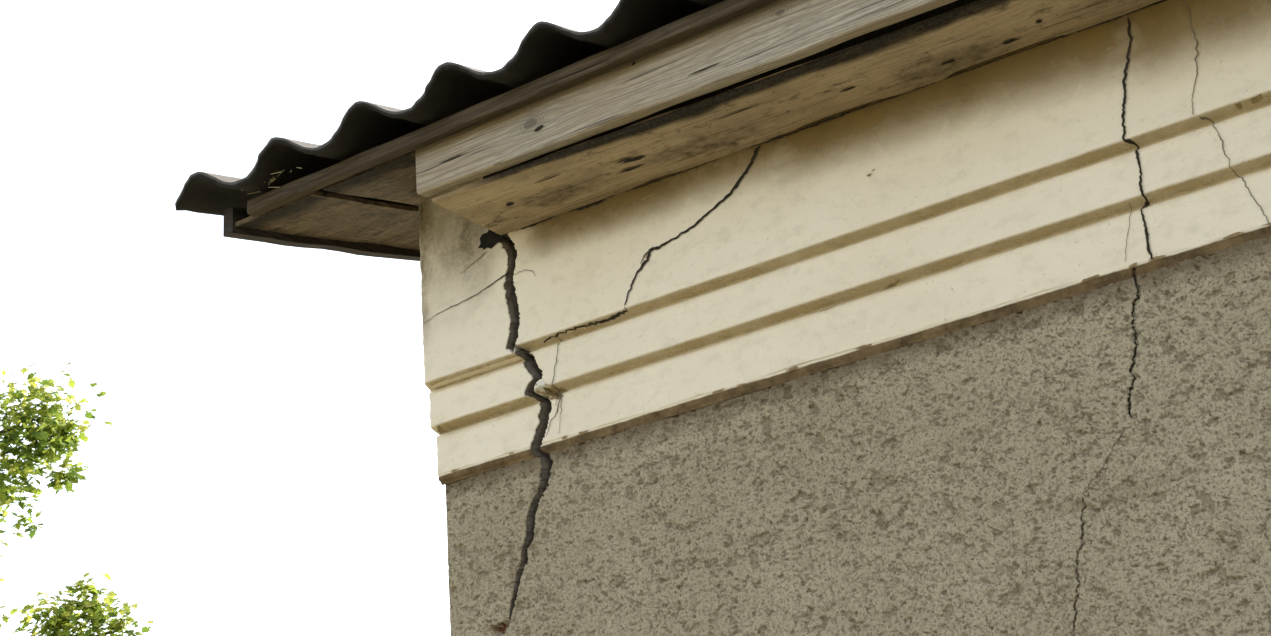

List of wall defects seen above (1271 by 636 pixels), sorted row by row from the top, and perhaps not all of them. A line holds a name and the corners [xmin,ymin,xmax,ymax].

crack [423,0,1270,636]